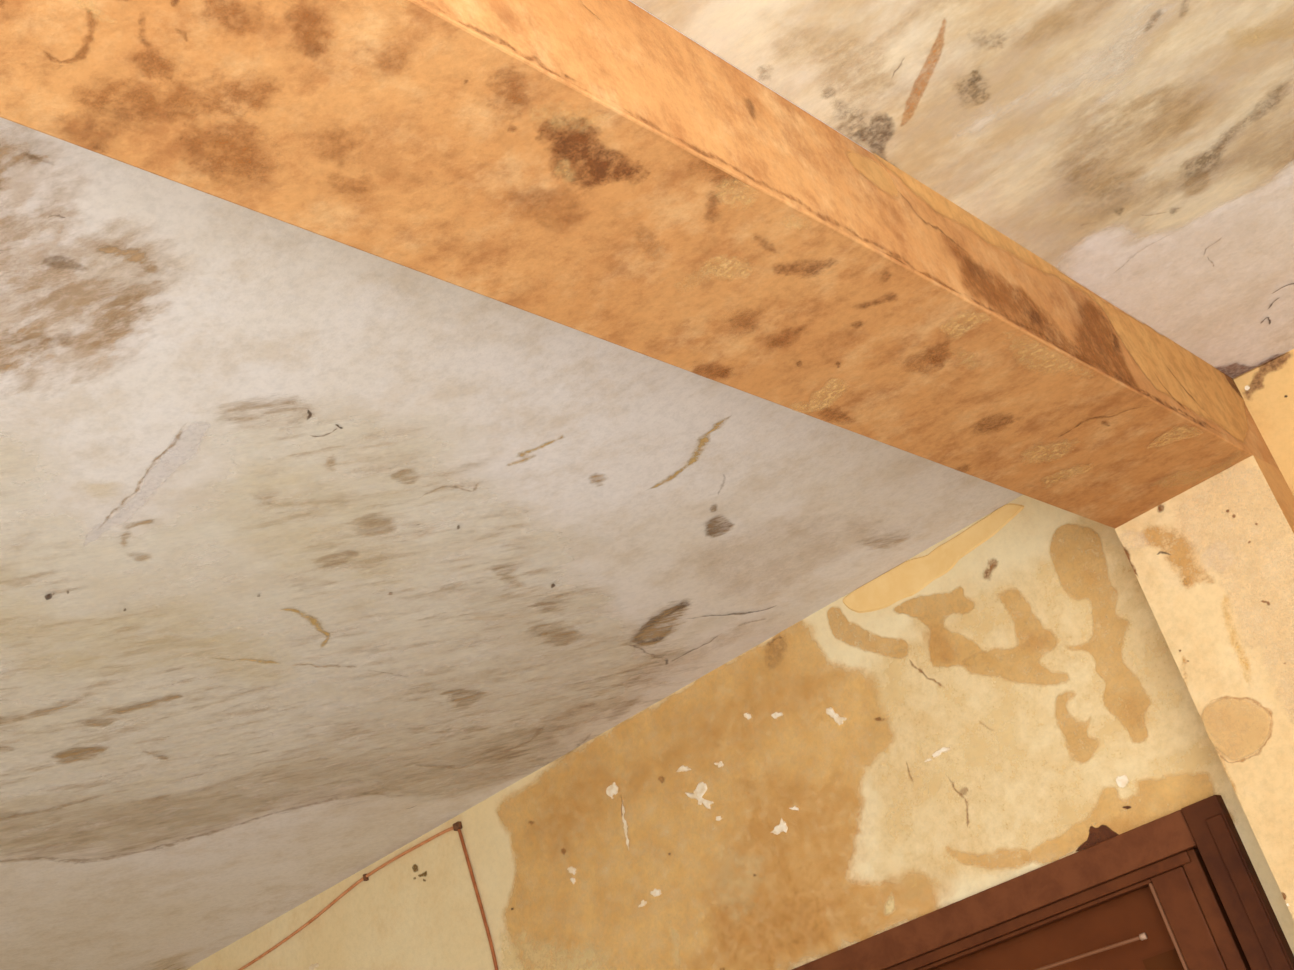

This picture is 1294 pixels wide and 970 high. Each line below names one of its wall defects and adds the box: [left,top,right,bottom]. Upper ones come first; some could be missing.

damp [539,119,634,186]
damp [630,0,1294,266]
damp [652,420,724,488]
damp [707,507,732,537]
damp [0,427,685,846]
damp [828,607,908,658]
flaking render [826,707,847,725]
flaking render [606,782,618,799]
flaking render [676,765,722,821]
damp [498,622,938,970]
flaking render [771,806,799,835]
flaking render [1076,825,1118,851]